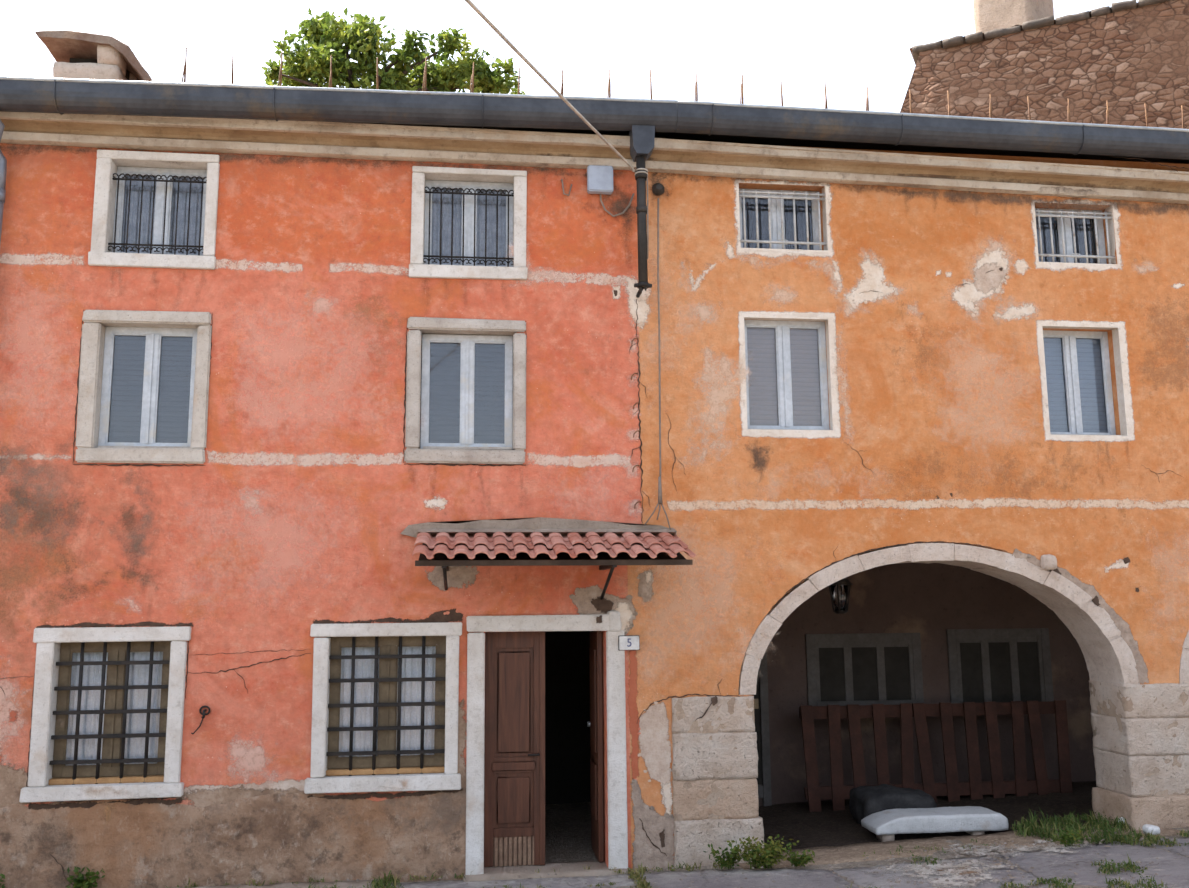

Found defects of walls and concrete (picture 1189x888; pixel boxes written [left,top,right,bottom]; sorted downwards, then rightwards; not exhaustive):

peeling [810,253,903,315]
peeling [936,241,1035,321]
damp [753,448,767,468]
spalling [569,569,654,635]
crack [185,641,311,698]
crack [0,645,181,803]
flaking render [0,680,467,810]
spalling [627,650,675,870]